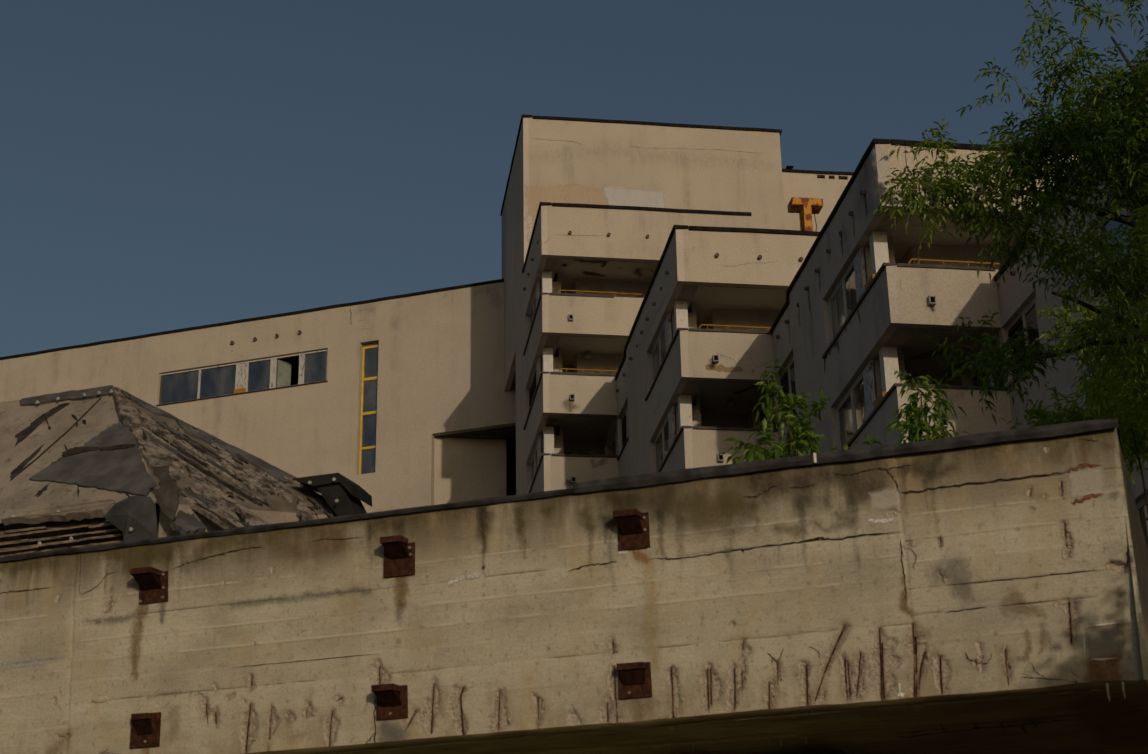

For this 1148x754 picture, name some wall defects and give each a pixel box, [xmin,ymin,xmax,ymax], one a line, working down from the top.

peeling [209,435,319,521]
crack [744,465,1065,498]
water stain [478,505,489,540]
crack [174,547,263,569]
crack [568,561,615,572]
crack [653,532,917,598]
crack [946,570,1097,613]
spalling [199,673,345,754]
spalling [405,676,469,735]
spalling [598,636,623,723]
spalling [699,638,752,719]
spalling [796,622,954,714]